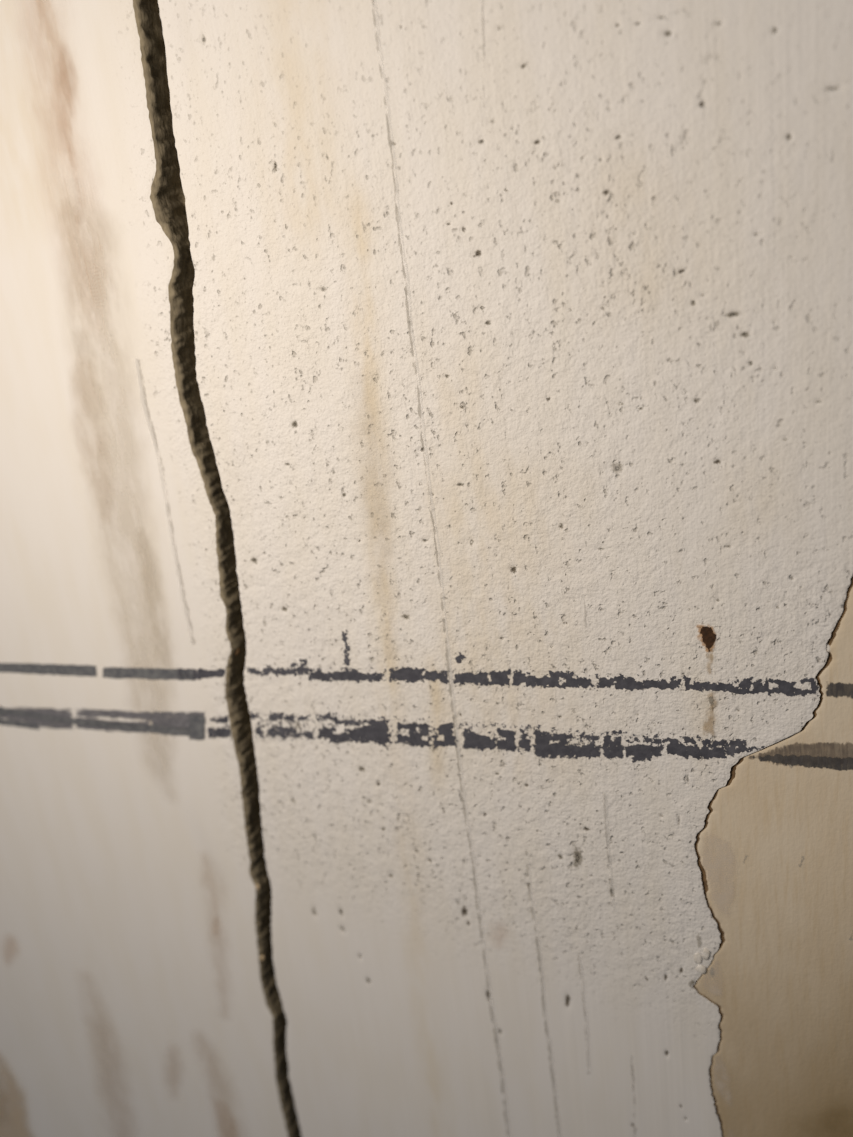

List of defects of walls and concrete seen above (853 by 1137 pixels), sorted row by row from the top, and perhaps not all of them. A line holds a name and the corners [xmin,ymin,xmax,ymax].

crack [133,0,302,1137]
corrosion [697,626,716,652]
peeling [680,587,853,1137]